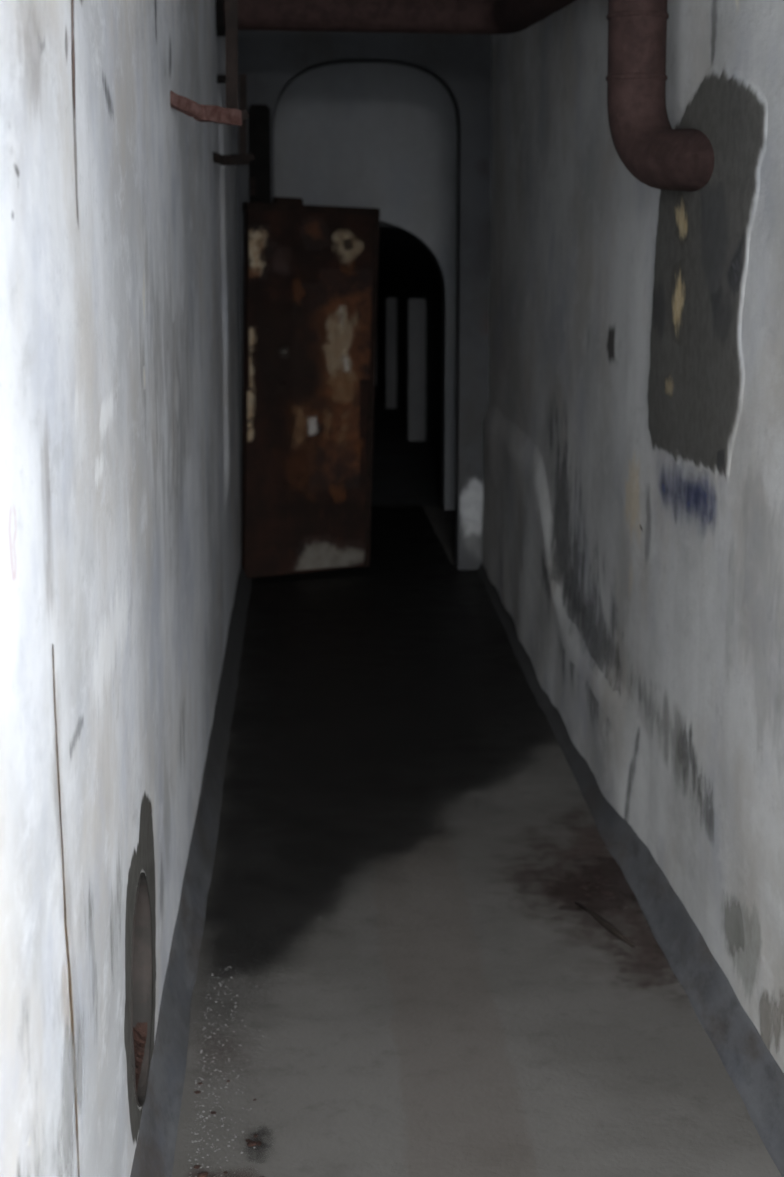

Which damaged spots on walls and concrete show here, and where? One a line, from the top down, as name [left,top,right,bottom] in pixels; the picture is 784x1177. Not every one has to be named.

corrosion [71,0,82,109]
corrosion [293,269,372,492]
peeling [647,60,769,487]
crack [52,646,78,1137]
peeling [124,784,157,1151]
damp [190,505,568,1015]